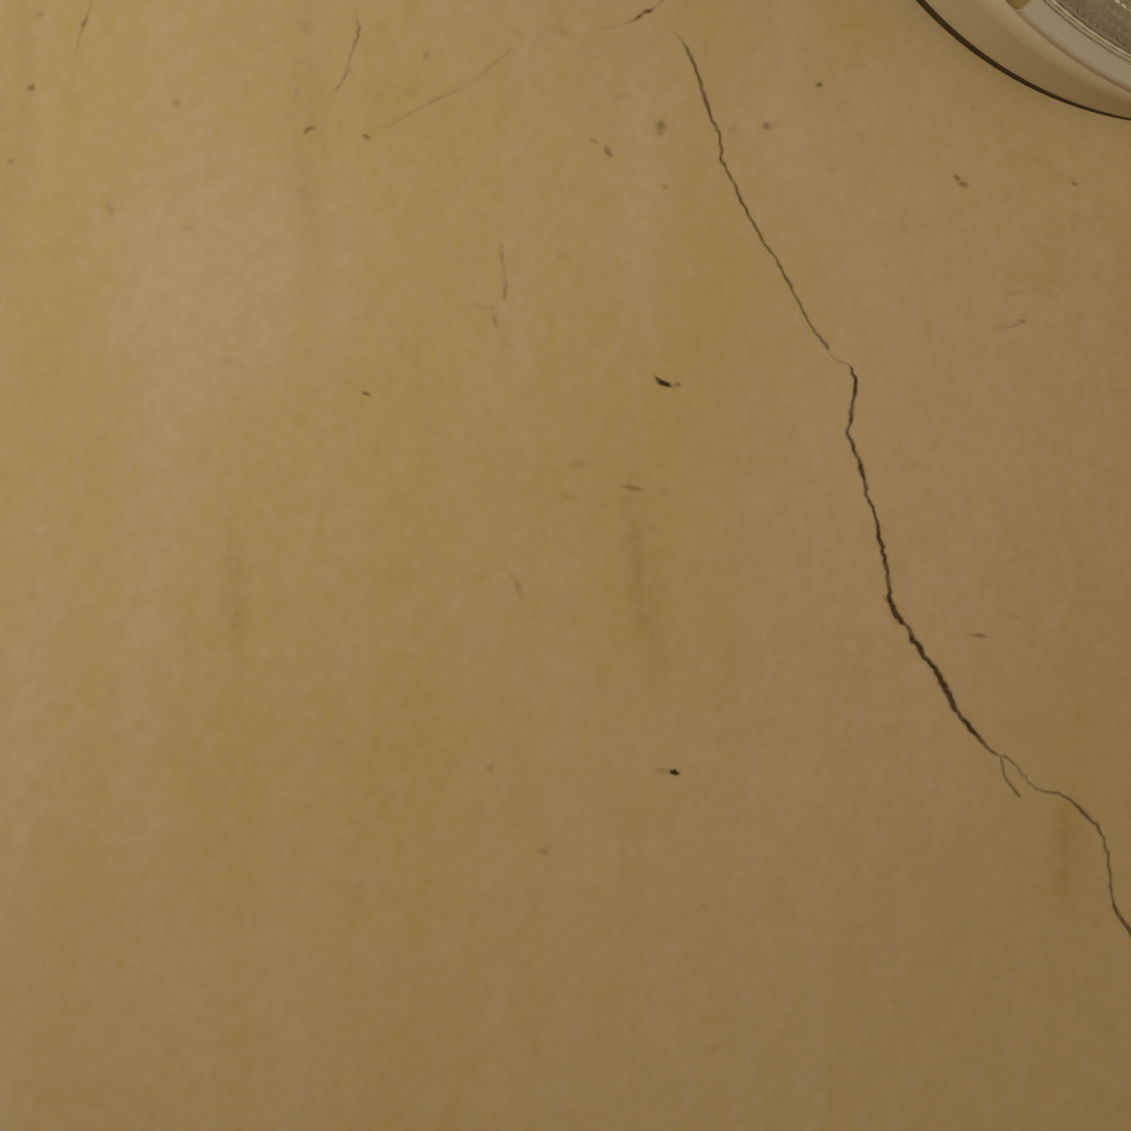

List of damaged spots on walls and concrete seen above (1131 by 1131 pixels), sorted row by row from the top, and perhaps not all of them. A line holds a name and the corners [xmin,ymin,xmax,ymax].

crack [846,370,994,753]